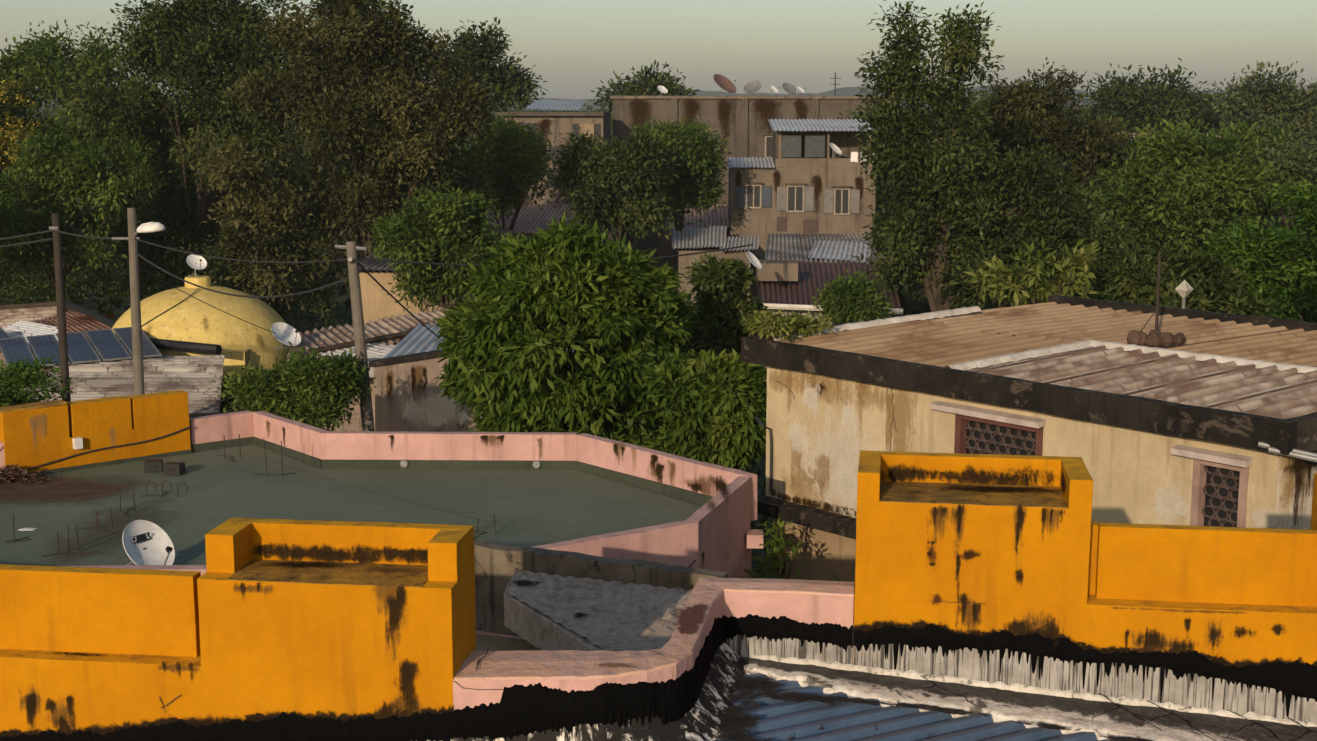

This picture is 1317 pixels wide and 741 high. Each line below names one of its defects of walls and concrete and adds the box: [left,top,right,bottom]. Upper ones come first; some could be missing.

water stain [650,455,729,509]
water stain [770,489,857,517]
water stain [880,465,1066,550]
water stain [956,555,981,632]
water stain [254,544,428,719]
water stain [1005,617,1059,646]
water stain [1113,607,1255,652]
water stain [21,688,74,730]